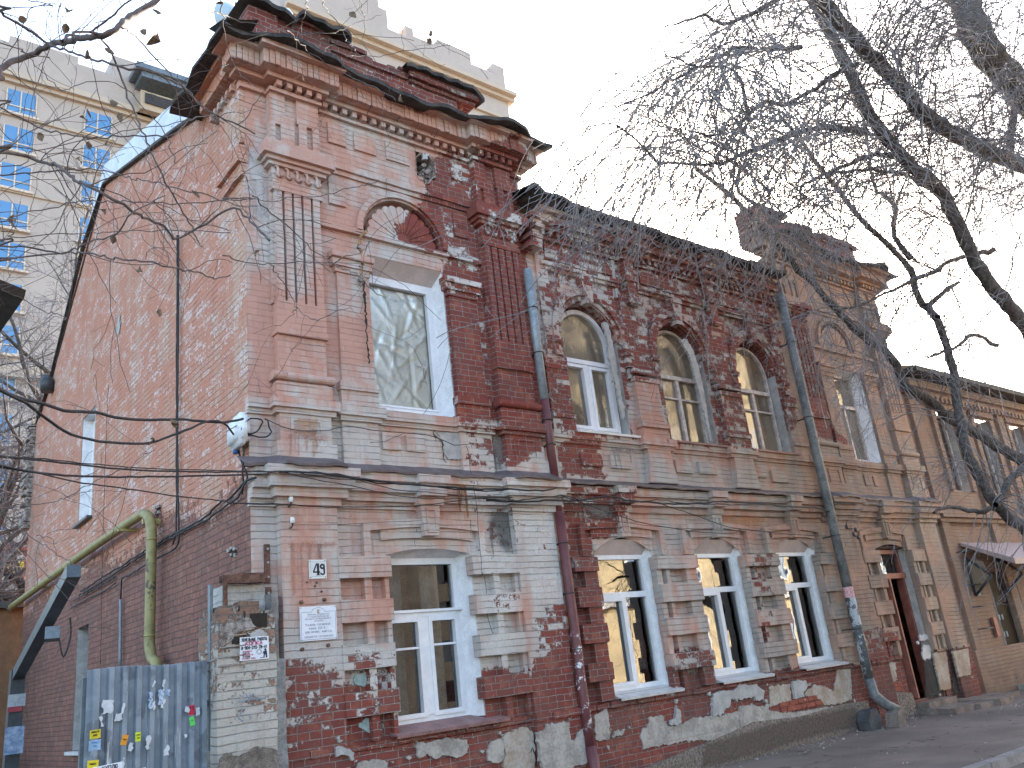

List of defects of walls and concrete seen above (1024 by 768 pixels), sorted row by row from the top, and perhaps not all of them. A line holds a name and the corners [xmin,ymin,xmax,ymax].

spalling [218,618,268,647]
peeling [353,672,367,687]
spalling [750,682,824,713]
peeling [358,714,381,741]